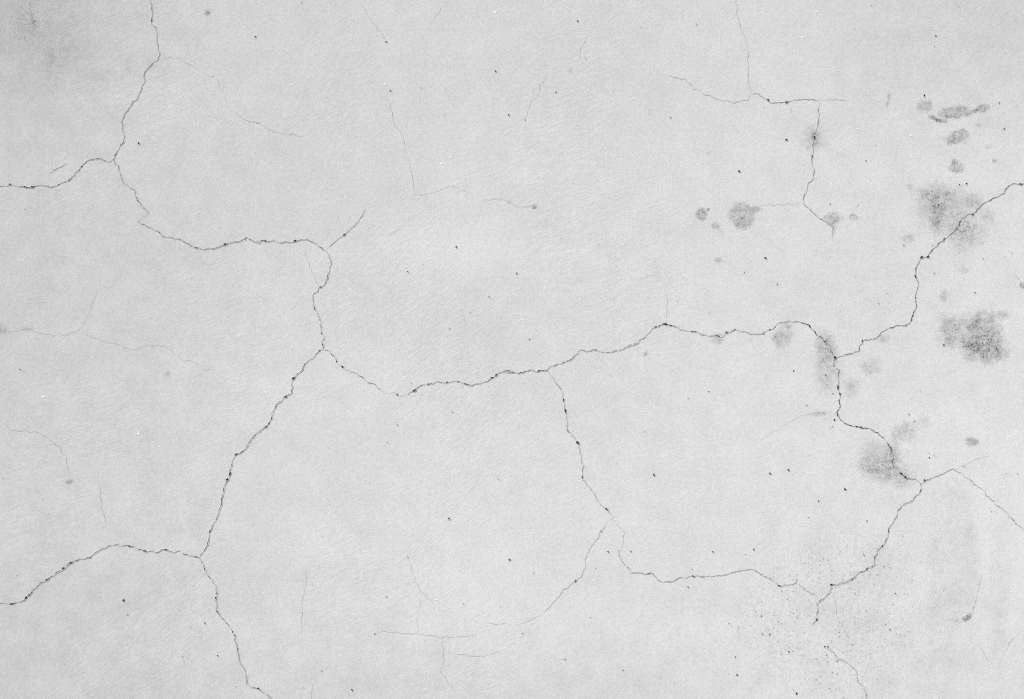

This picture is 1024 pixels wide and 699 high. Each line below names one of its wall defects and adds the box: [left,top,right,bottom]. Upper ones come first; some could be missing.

crack [667,1,848,232]
crack [0,0,383,699]
crack [391,183,1024,630]
crack [826,646,867,698]